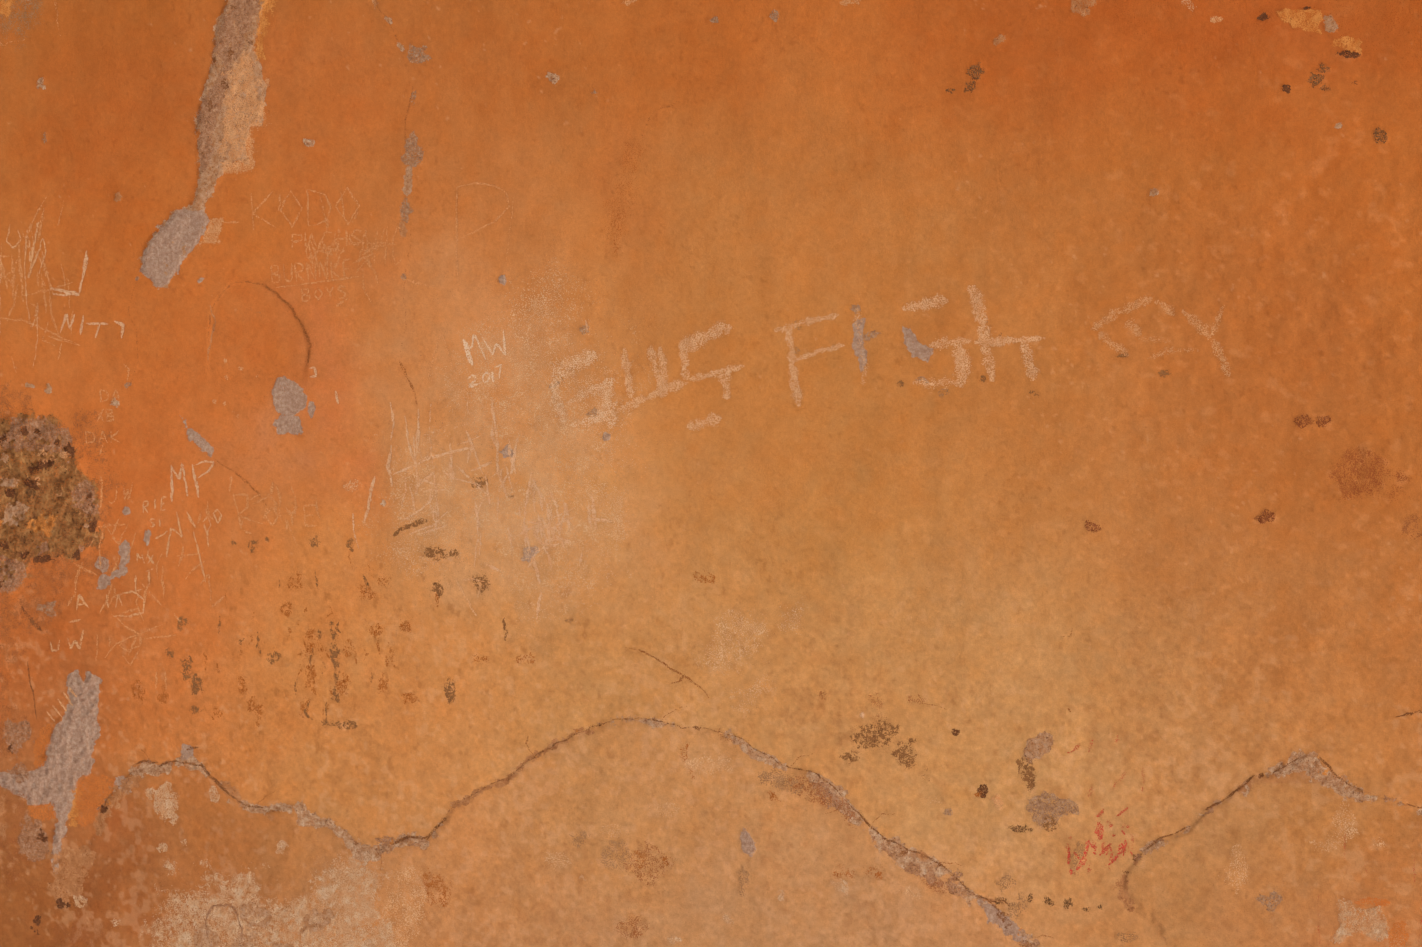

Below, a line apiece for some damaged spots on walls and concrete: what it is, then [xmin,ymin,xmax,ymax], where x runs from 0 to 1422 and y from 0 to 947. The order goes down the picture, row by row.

peeling [1257,6,1362,91]
spalling [137,0,277,290]
peeling [271,376,316,435]
spalling [0,377,151,635]
spalling [0,670,1035,947]
crack [96,647,1053,947]
peeling [1023,731,1054,764]
peeling [1026,791,1080,828]
crack [1113,749,1422,912]
spalling [1117,756,1422,947]